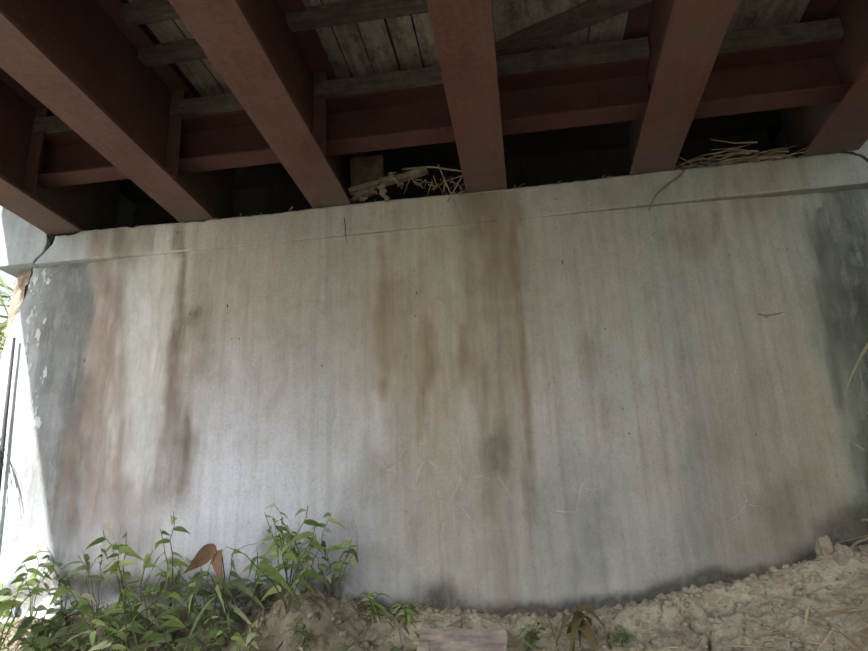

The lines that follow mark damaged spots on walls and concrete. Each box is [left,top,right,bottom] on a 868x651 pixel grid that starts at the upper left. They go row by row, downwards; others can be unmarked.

spalling [4,267,51,377]
peeling [22,365,48,467]
peeling [1,473,27,563]
leakage [825,505,868,547]